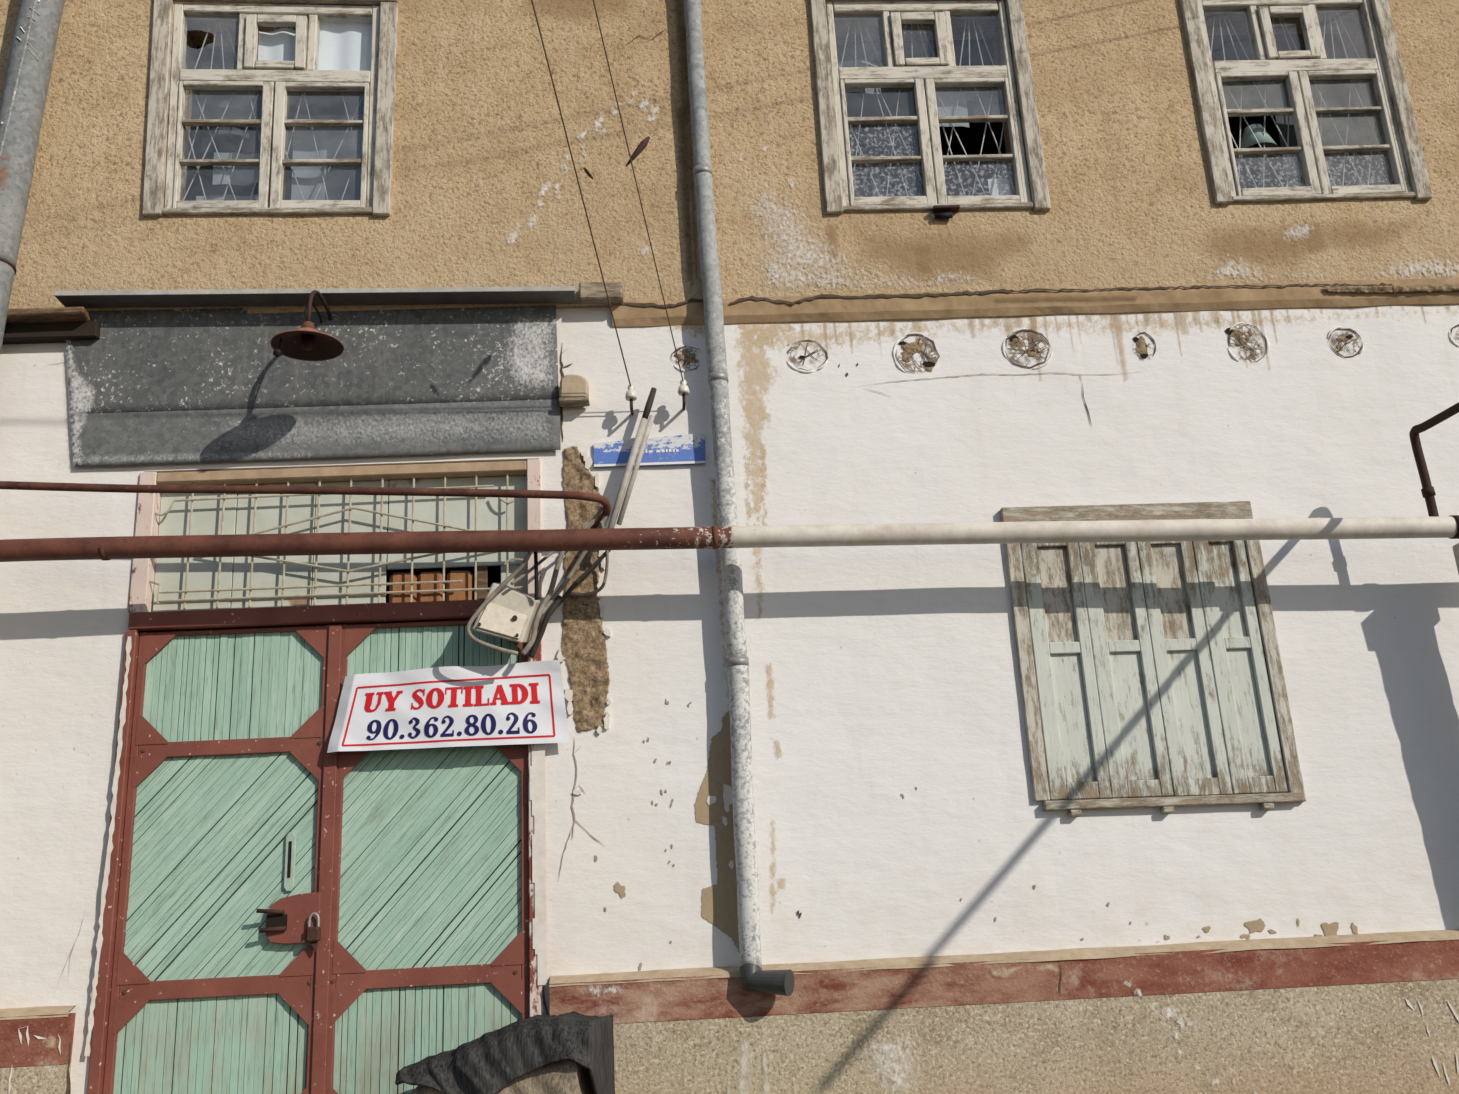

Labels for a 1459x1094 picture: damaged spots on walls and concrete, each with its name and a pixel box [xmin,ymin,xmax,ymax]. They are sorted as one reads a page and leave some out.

leakage [755,192,901,288]
leakage [1103,309,1290,363]
flaking render [562,446,602,529]
flaking render [557,550,611,735]
peeling [694,710,740,953]
peeling [1241,918,1277,939]
peeling [1315,922,1358,937]